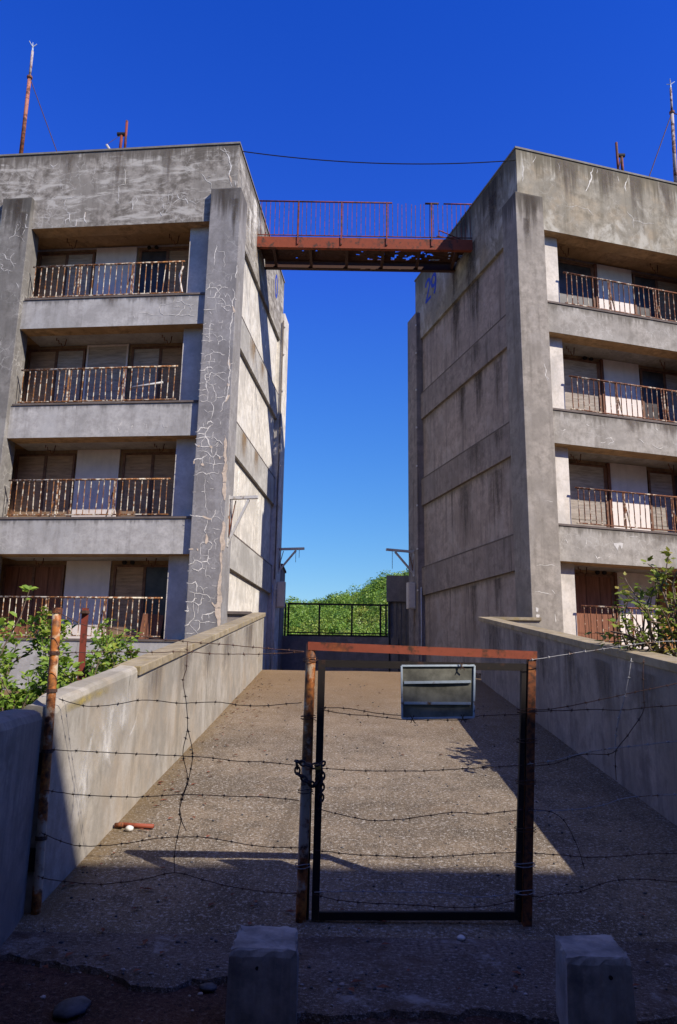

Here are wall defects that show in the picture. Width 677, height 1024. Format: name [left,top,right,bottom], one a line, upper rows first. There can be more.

crack [118,148,236,216]
water stain [524,195,536,233]
crack [133,247,237,634]